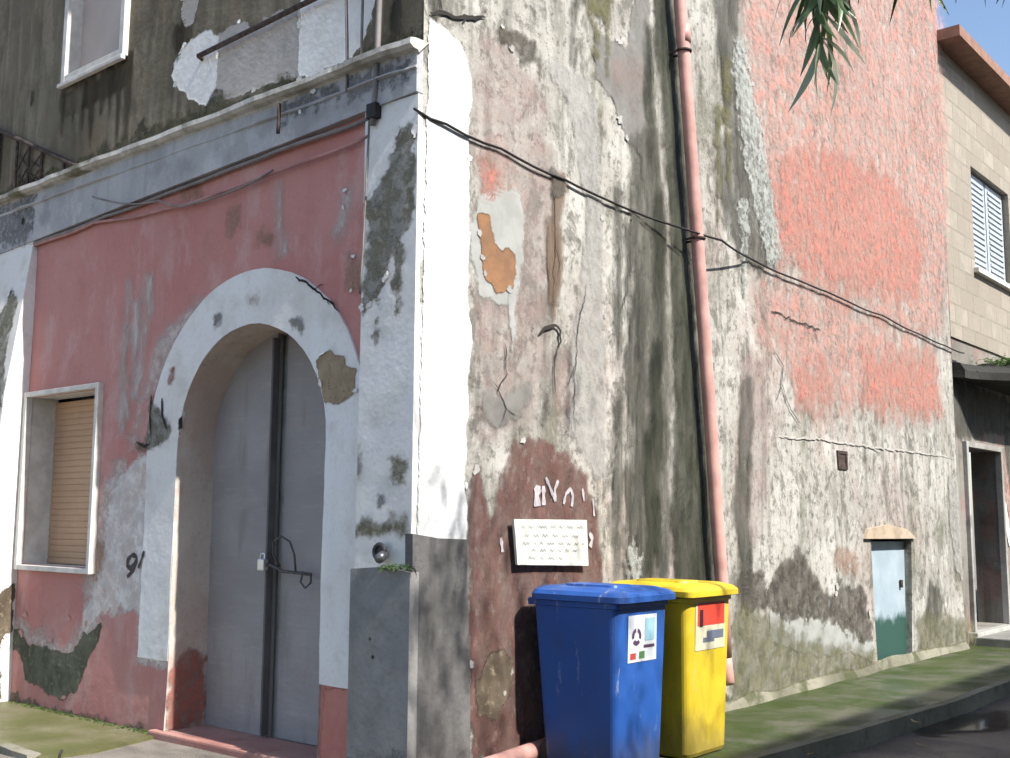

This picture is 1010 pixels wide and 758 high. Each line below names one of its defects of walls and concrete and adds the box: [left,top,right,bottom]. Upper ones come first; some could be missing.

flaking render [171,0,375,106]
leakage [594,17,611,76]
leakage [715,37,783,296]
peeling [118,275,201,443]
flaking render [314,350,357,404]
peeling [394,18,525,539]
leakage [478,380,532,428]
leakage [614,0,715,581]
peeling [0,454,146,654]
peeling [138,657,168,671]
leakage [736,377,875,661]
leakage [927,580,943,628]